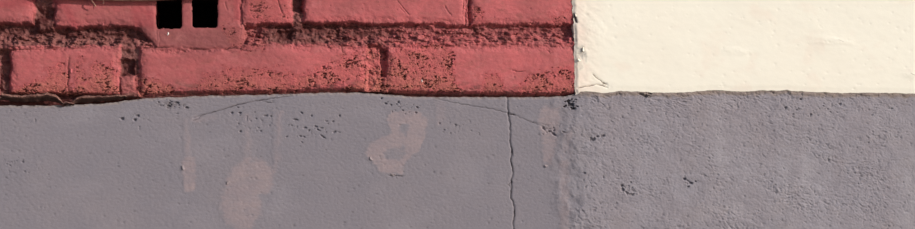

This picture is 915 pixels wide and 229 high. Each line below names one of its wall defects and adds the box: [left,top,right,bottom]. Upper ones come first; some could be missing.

spalling [221,0,295,54]
spalling [0,54,190,111]
spalling [190,39,463,177]
crack [507,114,515,221]